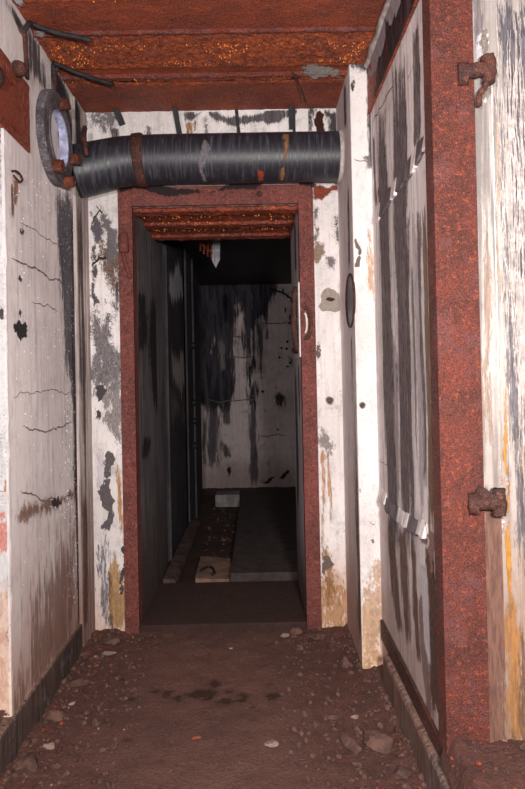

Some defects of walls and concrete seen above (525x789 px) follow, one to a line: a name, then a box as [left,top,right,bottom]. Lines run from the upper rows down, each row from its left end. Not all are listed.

water stain [472,0,483,60]
crack [12,258,75,288]
crack [24,422,72,433]
peeling [90,205,122,531]
water stain [199,284,277,485]
water stain [367,0,433,532]
water stain [482,0,525,561]
water stain [388,515,436,721]
water stain [485,510,506,743]